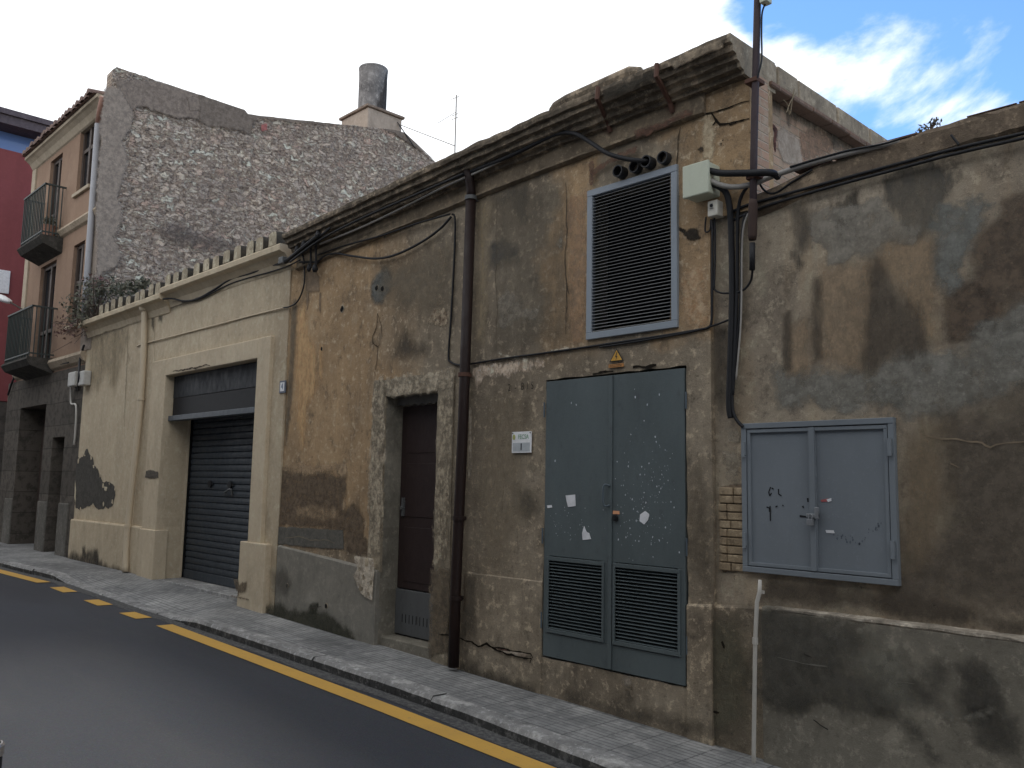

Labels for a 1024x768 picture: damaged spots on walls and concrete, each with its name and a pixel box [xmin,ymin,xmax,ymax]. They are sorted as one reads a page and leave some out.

crack [705,101,749,126]
damp [784,161,1024,373]
peeling [74,449,116,511]
flaking render [279,368,461,657]
crack [439,634,533,662]
damp [758,402,1024,735]